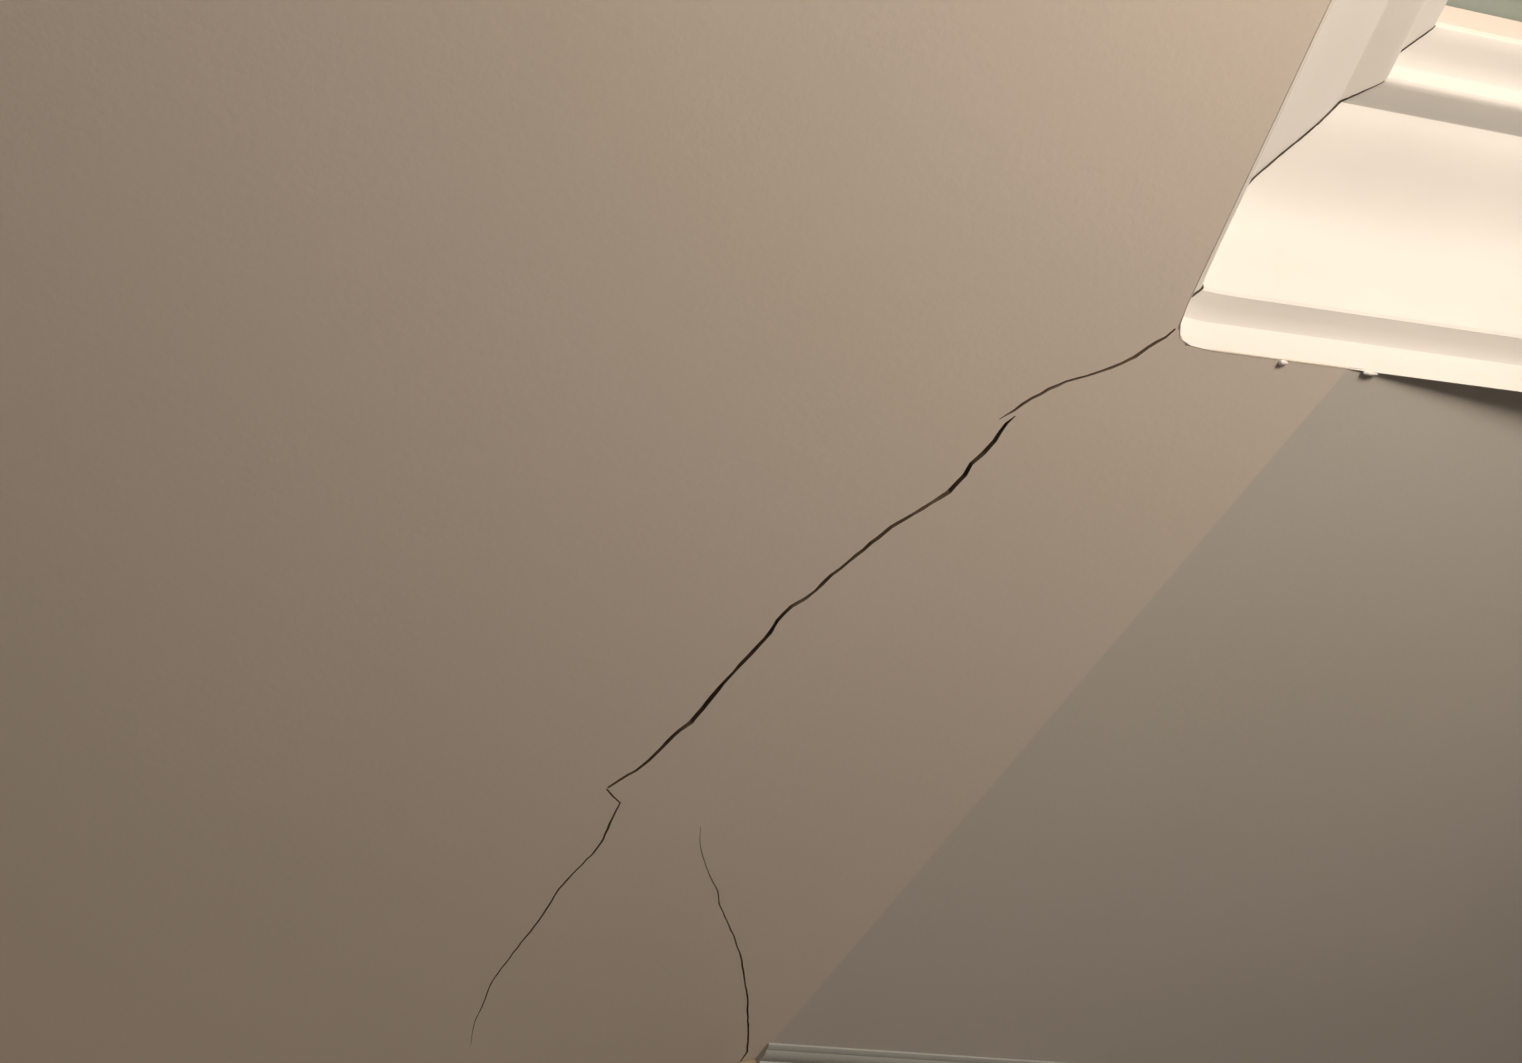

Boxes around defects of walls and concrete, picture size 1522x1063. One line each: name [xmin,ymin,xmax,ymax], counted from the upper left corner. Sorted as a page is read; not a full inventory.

crack [1249,25,1436,184]
crack [470,329,1176,1062]